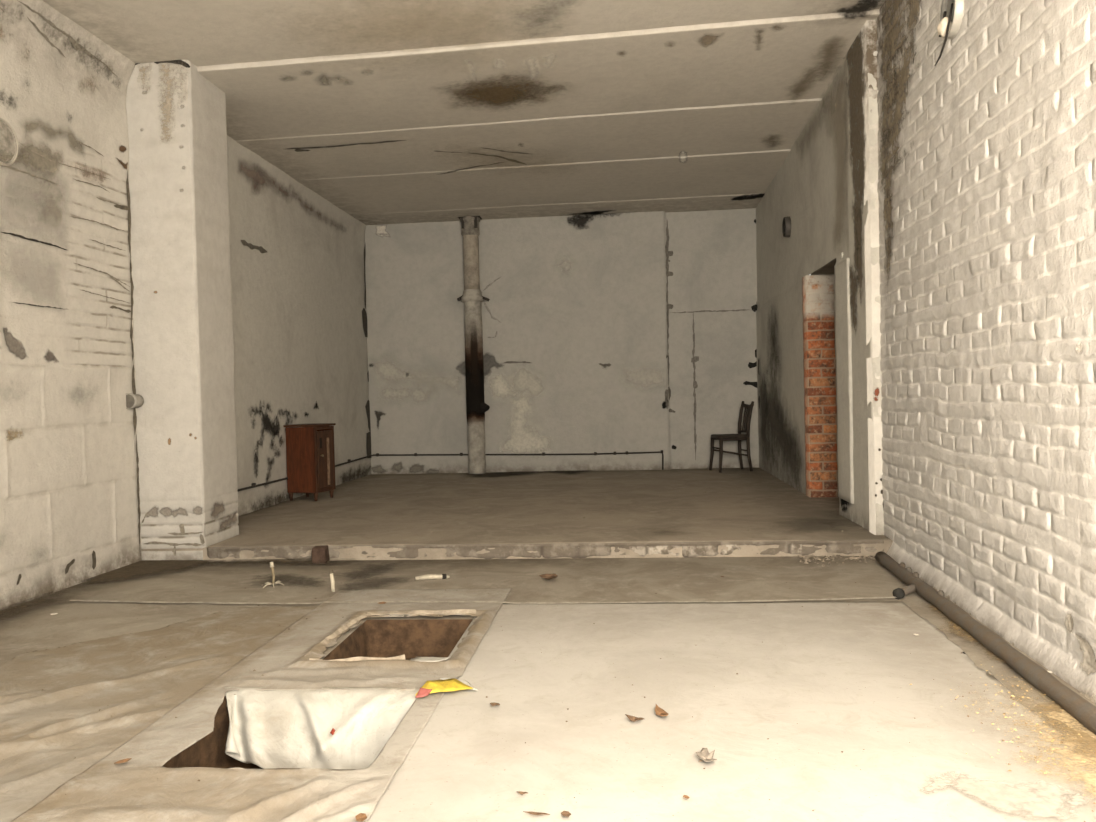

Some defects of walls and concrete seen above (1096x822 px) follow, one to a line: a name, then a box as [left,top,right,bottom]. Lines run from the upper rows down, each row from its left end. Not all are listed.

leakage [823,32,866,332]
leakage [837,0,921,278]
leakage [252,401,319,482]
leakage [465,336,485,421]
peeling [483,353,548,452]
leakage [760,315,800,472]